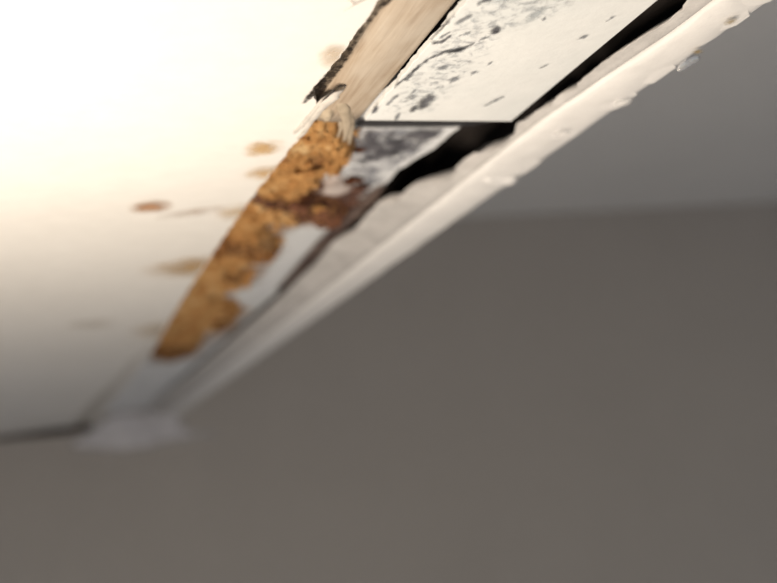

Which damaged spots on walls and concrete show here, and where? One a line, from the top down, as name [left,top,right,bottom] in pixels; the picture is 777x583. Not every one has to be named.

rust [252,144,273,153]
rust [250,178,384,291]
leakage [344,121,490,195]
spalling [144,0,712,415]